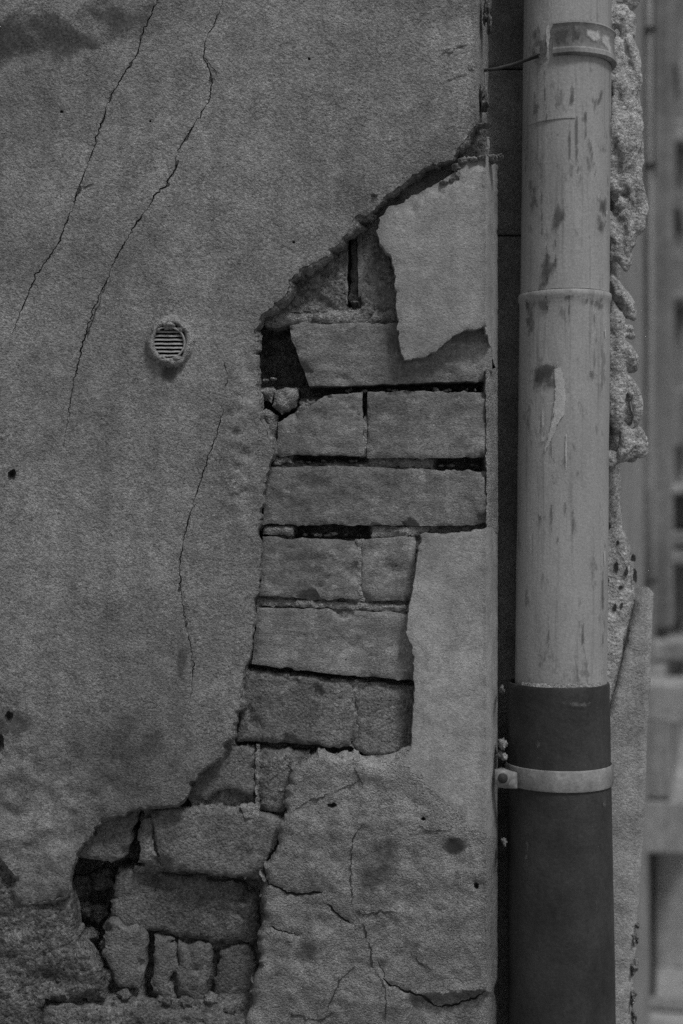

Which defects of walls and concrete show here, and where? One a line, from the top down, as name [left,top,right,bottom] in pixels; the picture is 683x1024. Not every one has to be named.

crack [13,0,158,332]
crack [63,0,223,448]
crack [178,363,229,714]
spalling [0,82,504,1024]